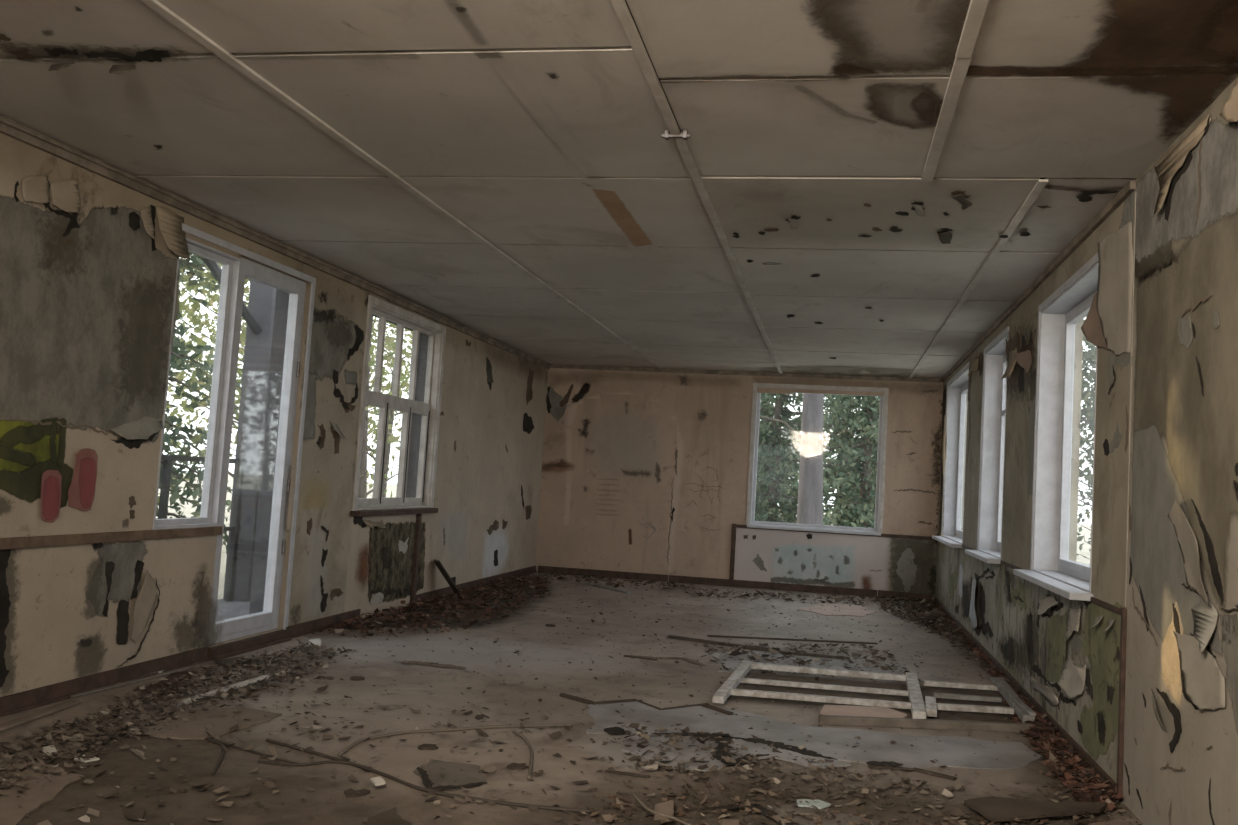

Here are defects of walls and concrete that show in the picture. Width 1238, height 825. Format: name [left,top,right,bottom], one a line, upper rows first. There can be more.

peeling [0,33,183,74]
leakage [658,0,971,129]
leakage [966,0,1238,139]
peeling [858,201,925,237]
peeling [937,191,972,244]
peeling [0,175,190,449]
peeling [301,307,364,454]
peeling [523,367,573,434]
peeling [1081,78,1238,753]
crack [666,447,678,571]
peeling [85,541,160,668]
peeling [941,561,993,638]